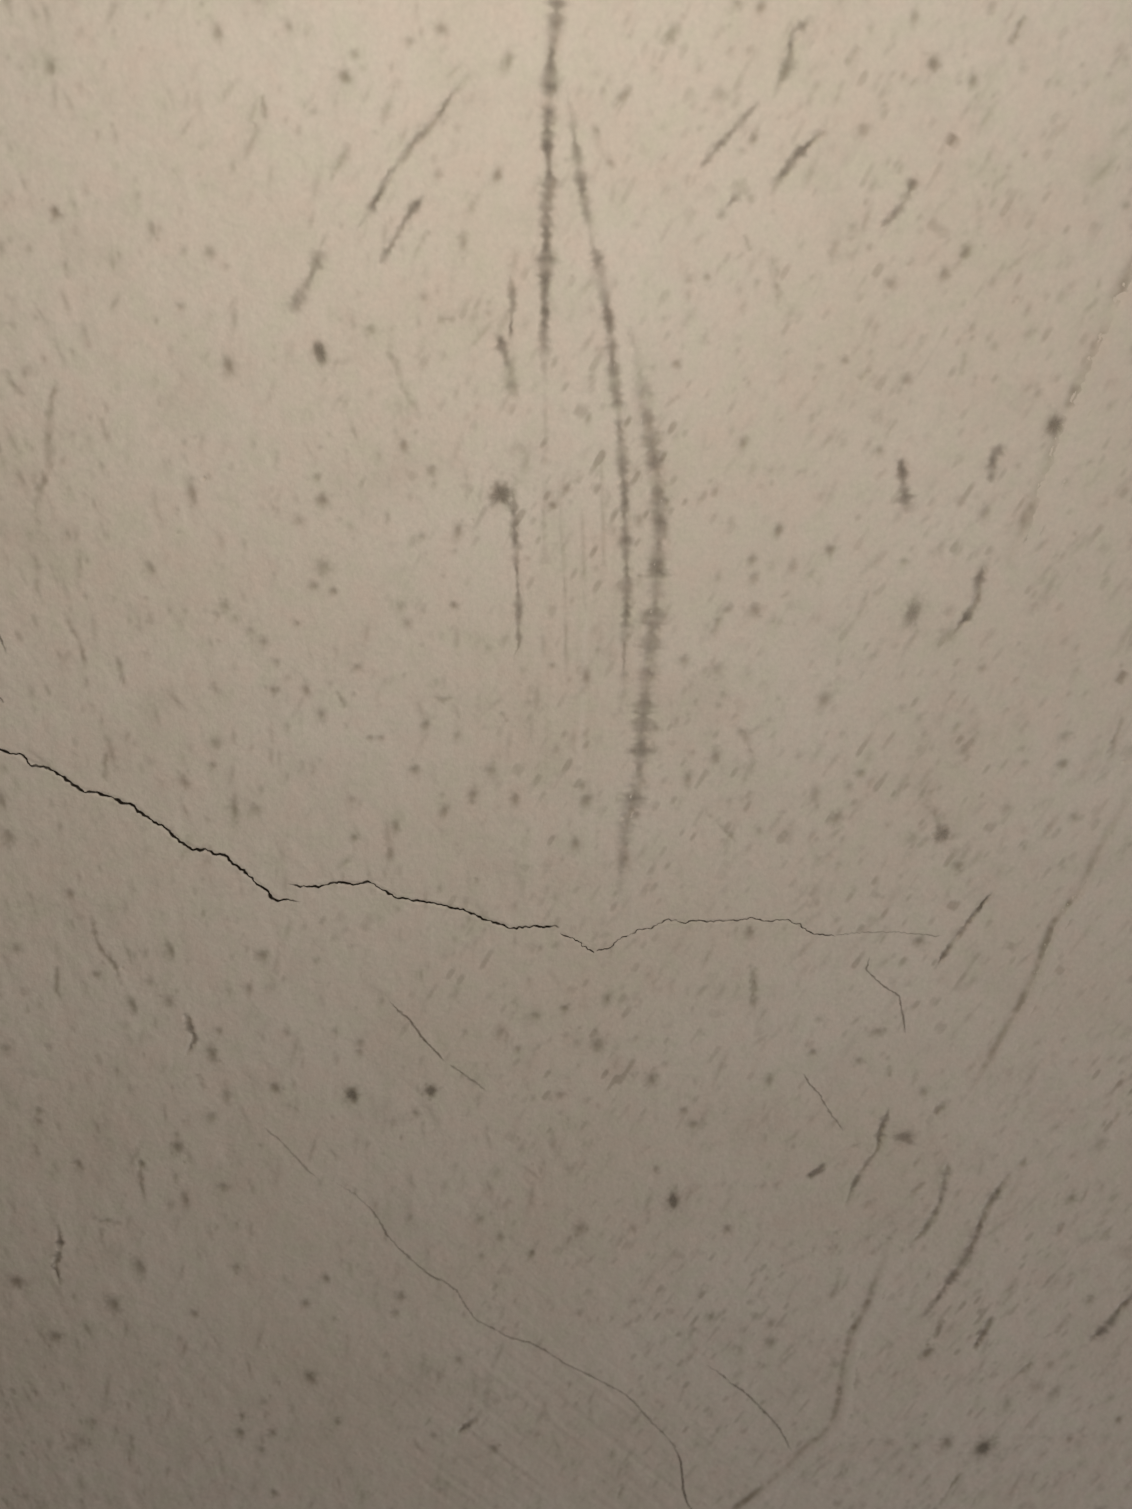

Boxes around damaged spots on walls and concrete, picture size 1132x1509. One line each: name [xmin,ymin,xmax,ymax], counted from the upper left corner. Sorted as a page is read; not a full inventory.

crack [0,749,830,953]